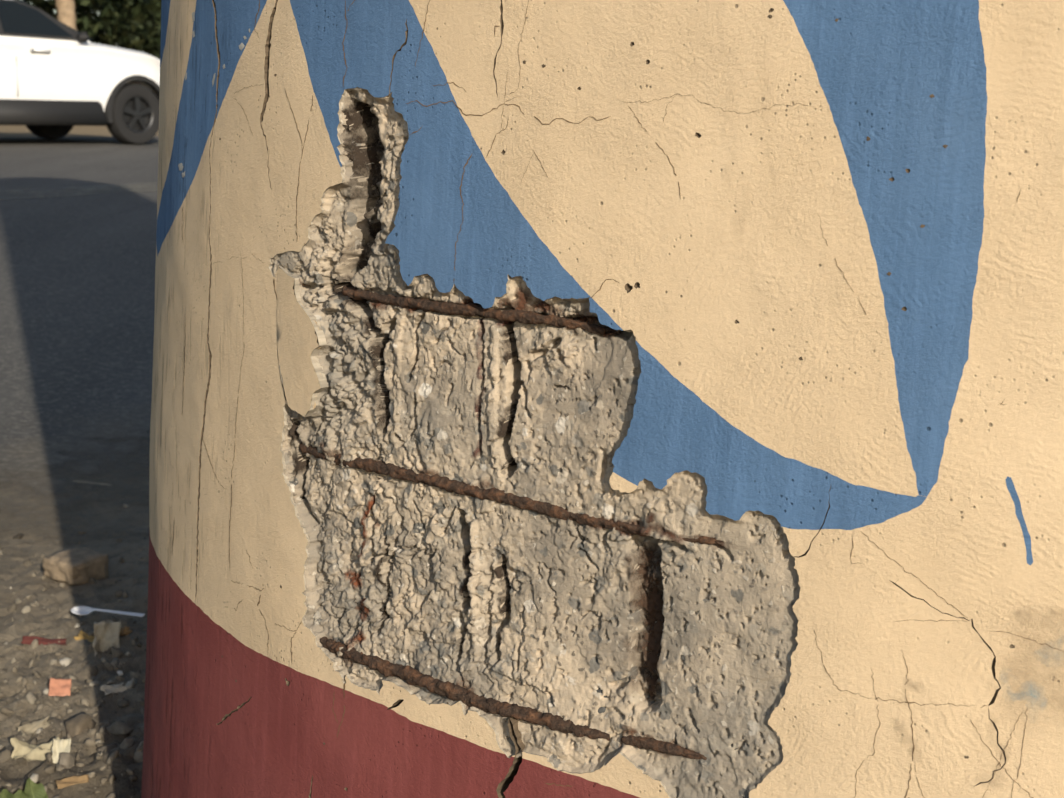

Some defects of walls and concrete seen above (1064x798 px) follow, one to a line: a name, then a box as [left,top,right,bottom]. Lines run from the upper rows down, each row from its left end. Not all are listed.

crack [172,0,313,660]
rust [498,290,555,365]
rust [566,314,624,337]
rust [289,421,310,474]
rust [497,403,518,437]
spalling [268,87,800,798]
rust [357,550,391,619]
rust [459,549,471,598]
rust [492,561,511,615]
rust [621,514,683,700]
crack [814,531,1064,798]
crack [496,717,525,798]